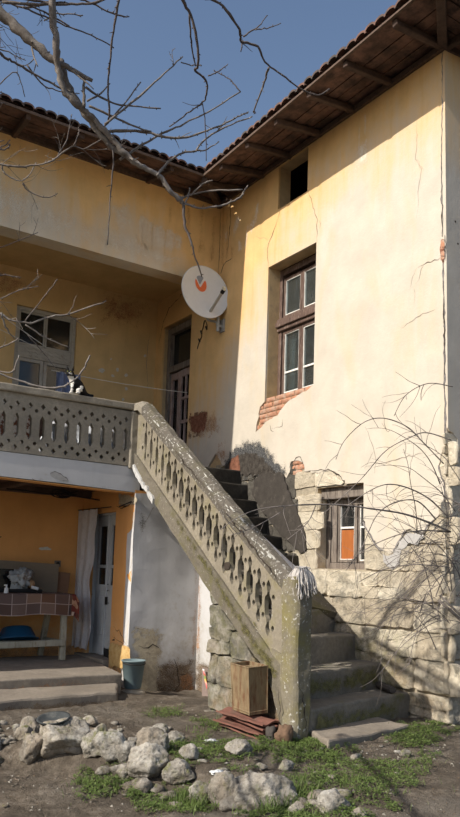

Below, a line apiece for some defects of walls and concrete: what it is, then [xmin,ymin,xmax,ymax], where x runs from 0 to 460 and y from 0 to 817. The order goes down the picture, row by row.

crack [437,52,445,237]
crack [404,257,447,433]
spalling [257,385,313,430]
mould [222,439,286,480]
peeling [117,464,155,531]
flaking render [221,433,460,726]
peeling [109,622,165,692]